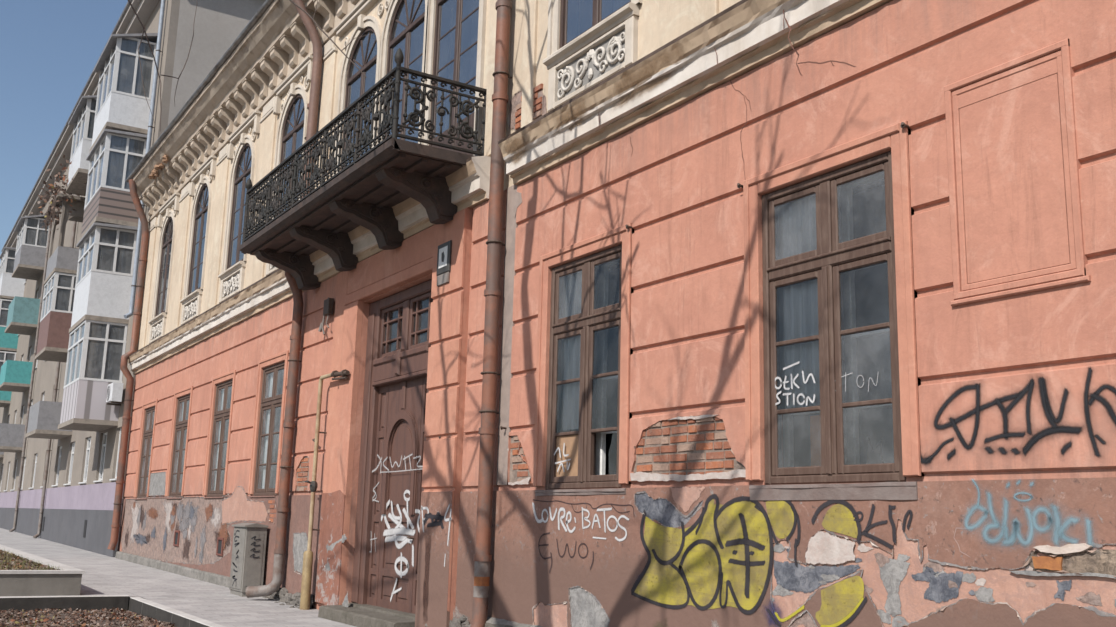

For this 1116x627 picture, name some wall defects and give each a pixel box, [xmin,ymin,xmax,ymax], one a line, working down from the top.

crack [783,9,856,67]
flaking render [507,434,532,485]
flaking render [630,415,746,528]
peeling [121,472,276,565]
flaking render [532,585,610,627]
peeling [770,519,1116,627]